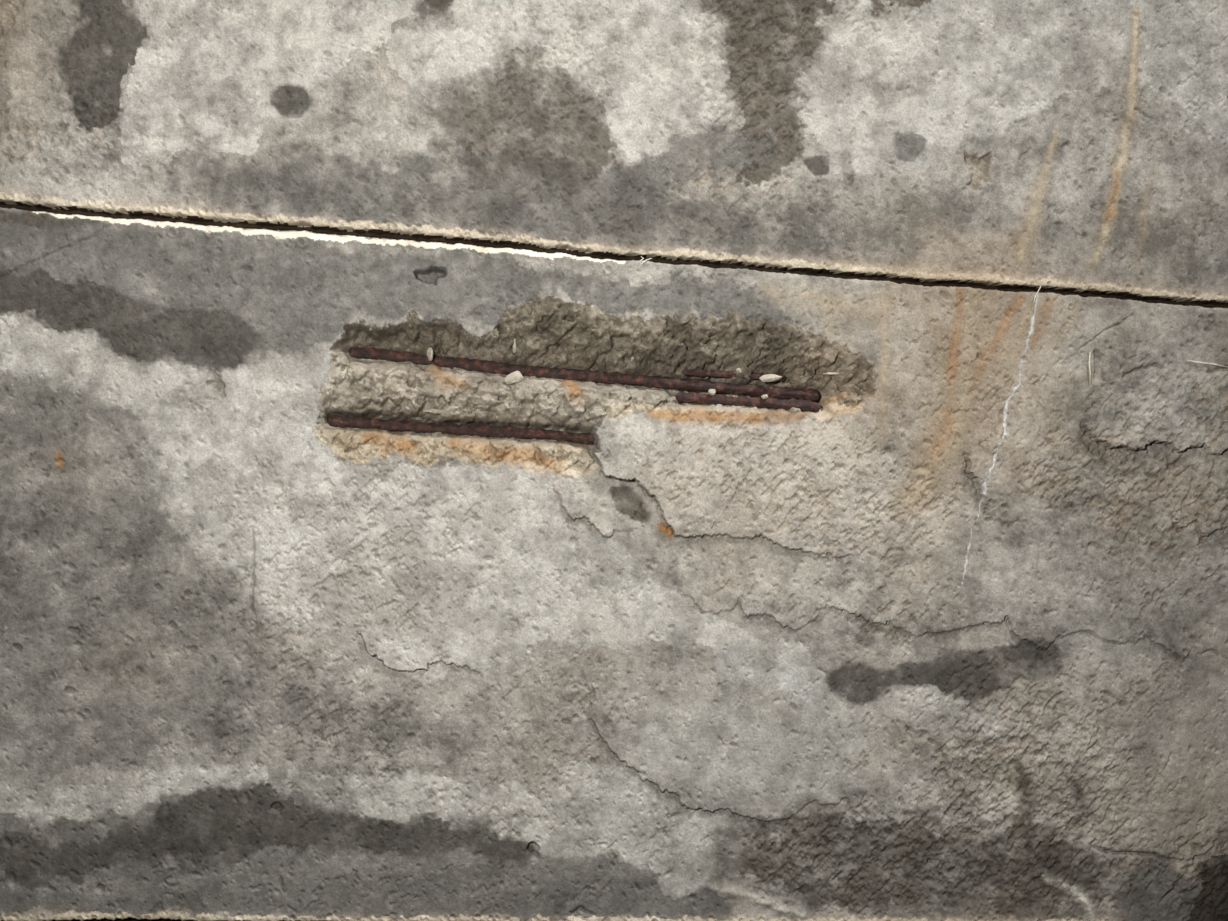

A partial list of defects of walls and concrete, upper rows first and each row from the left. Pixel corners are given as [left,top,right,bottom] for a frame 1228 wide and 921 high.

water stain [60,0,1228,244]
rust [1016,127,1059,262]
rust [1090,4,1139,262]
water stain [0,205,1061,921]
spalling [312,296,879,538]
crack [589,417,861,559]
crack [681,596,1228,664]
crack [962,295,1039,584]
crack [1080,363,1228,456]
crack [587,672,872,838]
water stain [983,816,1101,921]
water stain [1088,697,1228,921]